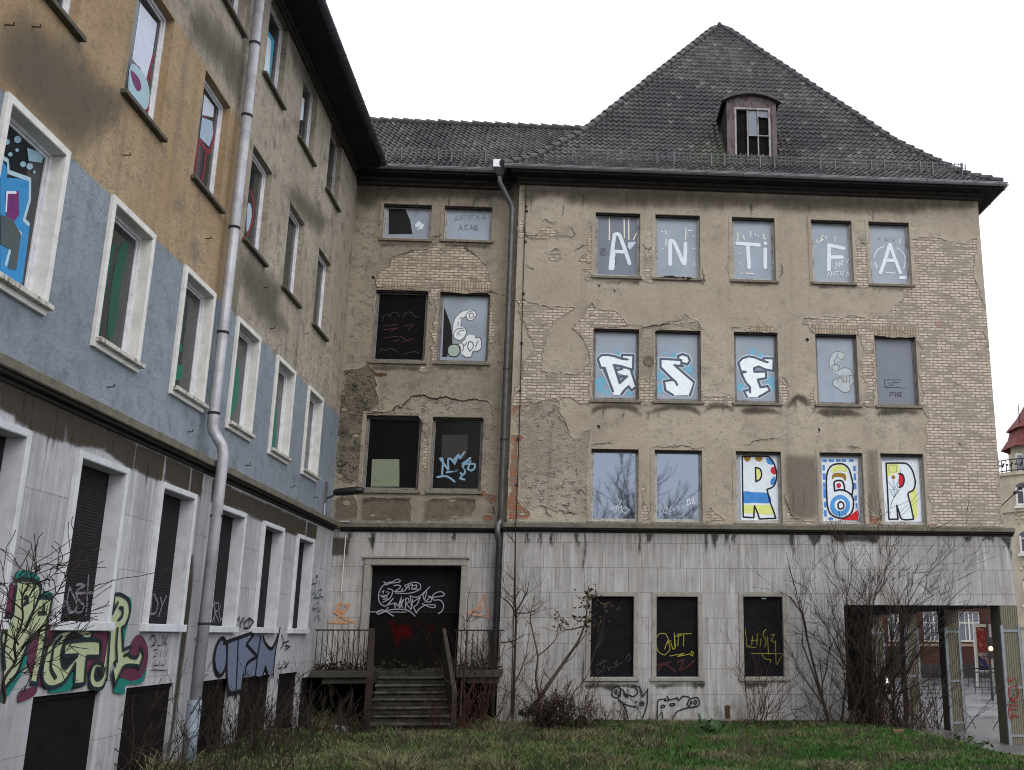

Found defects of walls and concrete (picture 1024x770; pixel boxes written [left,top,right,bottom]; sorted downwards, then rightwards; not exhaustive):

flaking render [517,204,560,240]
water stain [0,381,317,539]
spalling [333,242,706,522]
flaking render [801,235,1004,526]
water stain [332,533,351,555]